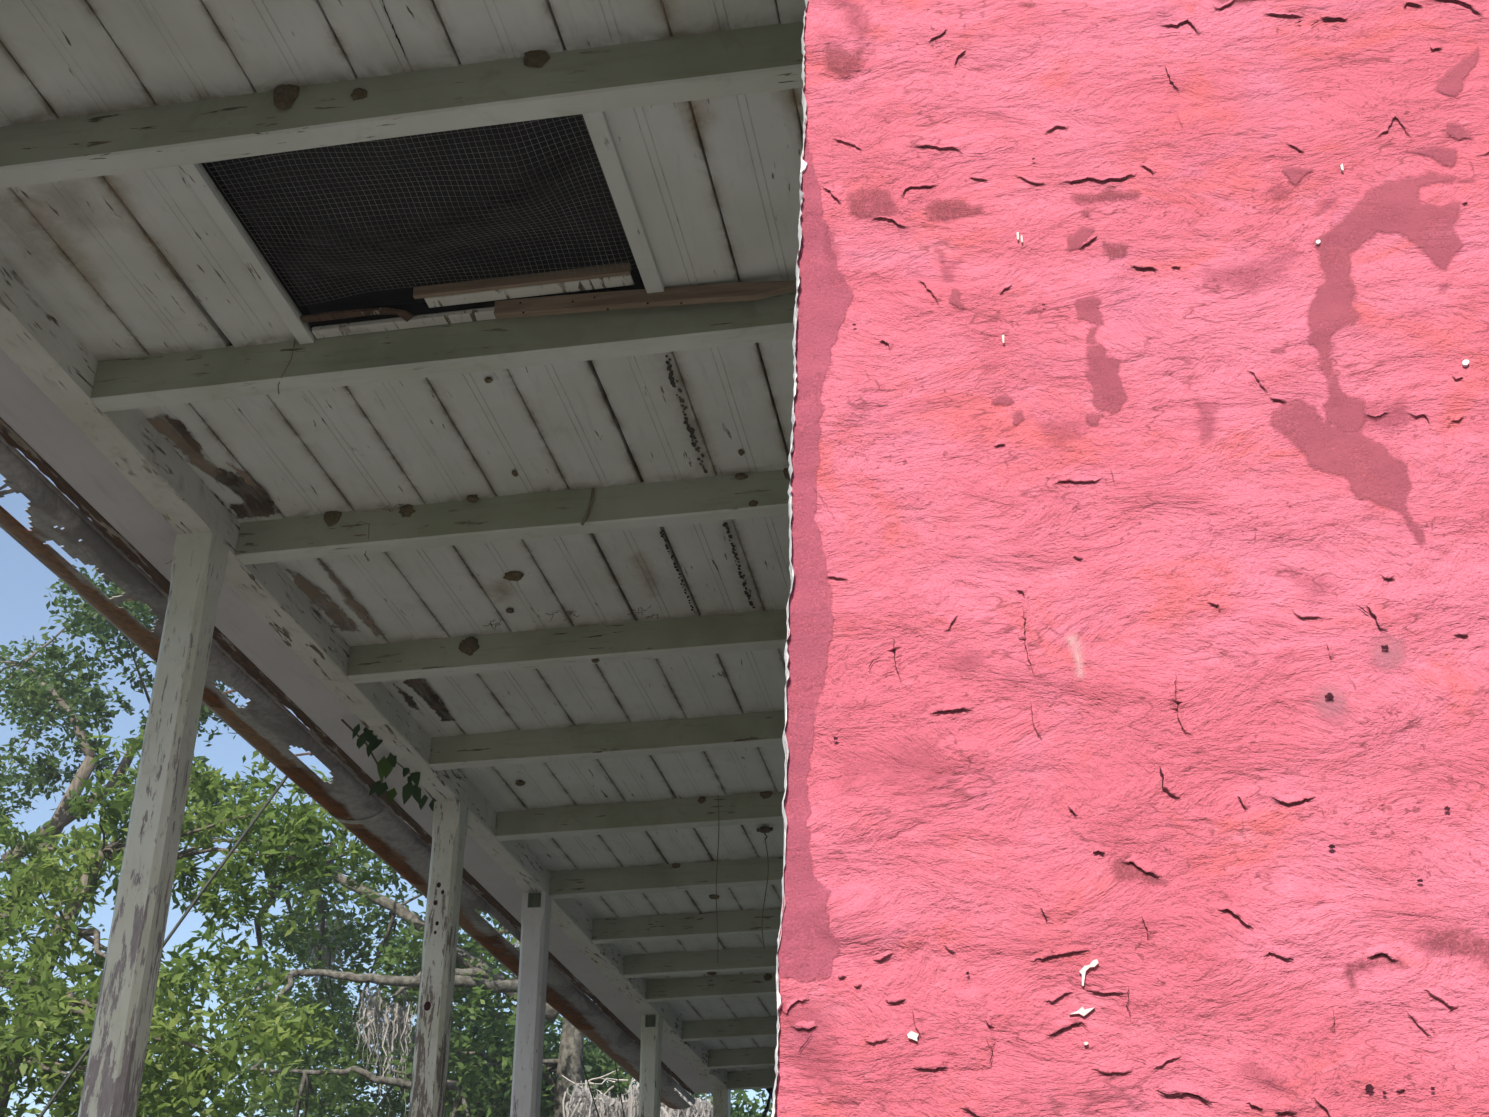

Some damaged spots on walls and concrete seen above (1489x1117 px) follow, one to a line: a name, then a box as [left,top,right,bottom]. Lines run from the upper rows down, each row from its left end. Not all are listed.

peeling [148,415,281,519]
rust [202,689,224,708]